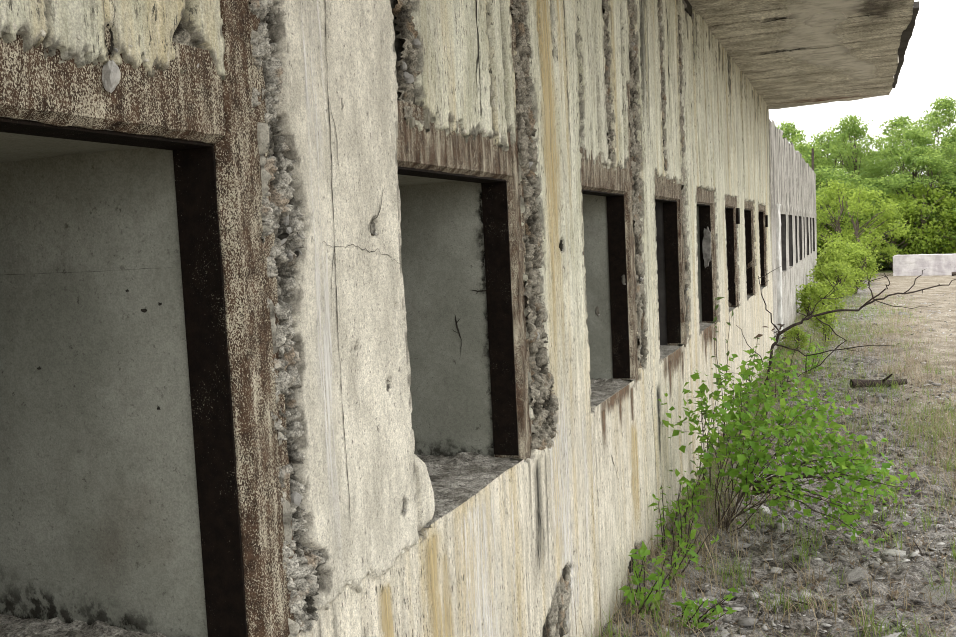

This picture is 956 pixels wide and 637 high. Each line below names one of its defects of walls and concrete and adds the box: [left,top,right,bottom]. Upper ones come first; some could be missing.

spalling [105,24,133,55]
spalling [172,20,201,49]
spalling [392,0,425,124]
spalling [602,0,615,161]
spalling [249,0,330,633]
crack [322,59,400,521]
spalling [511,0,559,450]
spalling [622,0,649,368]
water stain [414,444,454,456]
water stain [530,415,579,588]
water stain [0,590,147,634]
spalling [542,564,572,637]